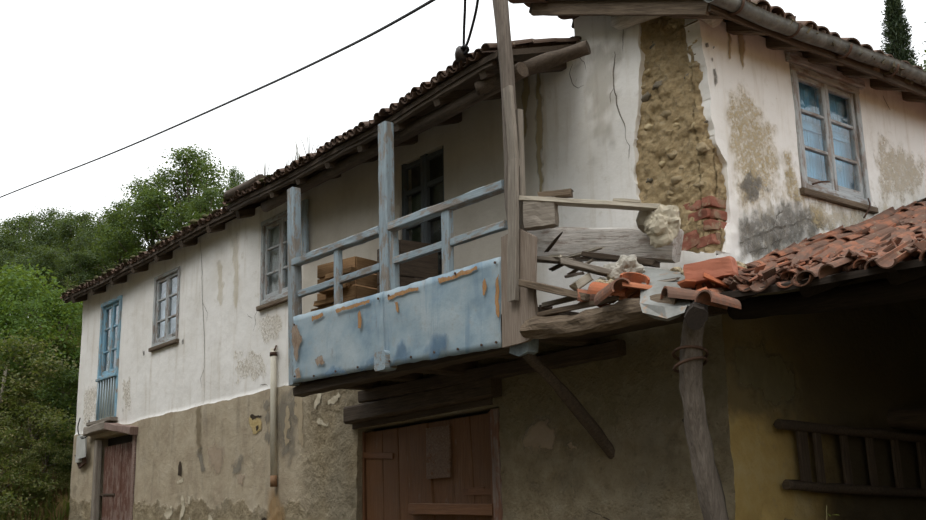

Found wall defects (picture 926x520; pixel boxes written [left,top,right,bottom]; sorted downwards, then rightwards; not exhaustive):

crack [610,29,630,149]
flaking render [636,16,727,253]
water stain [741,172,762,200]
water stain [740,203,824,256]
flaking render [164,494,191,520]